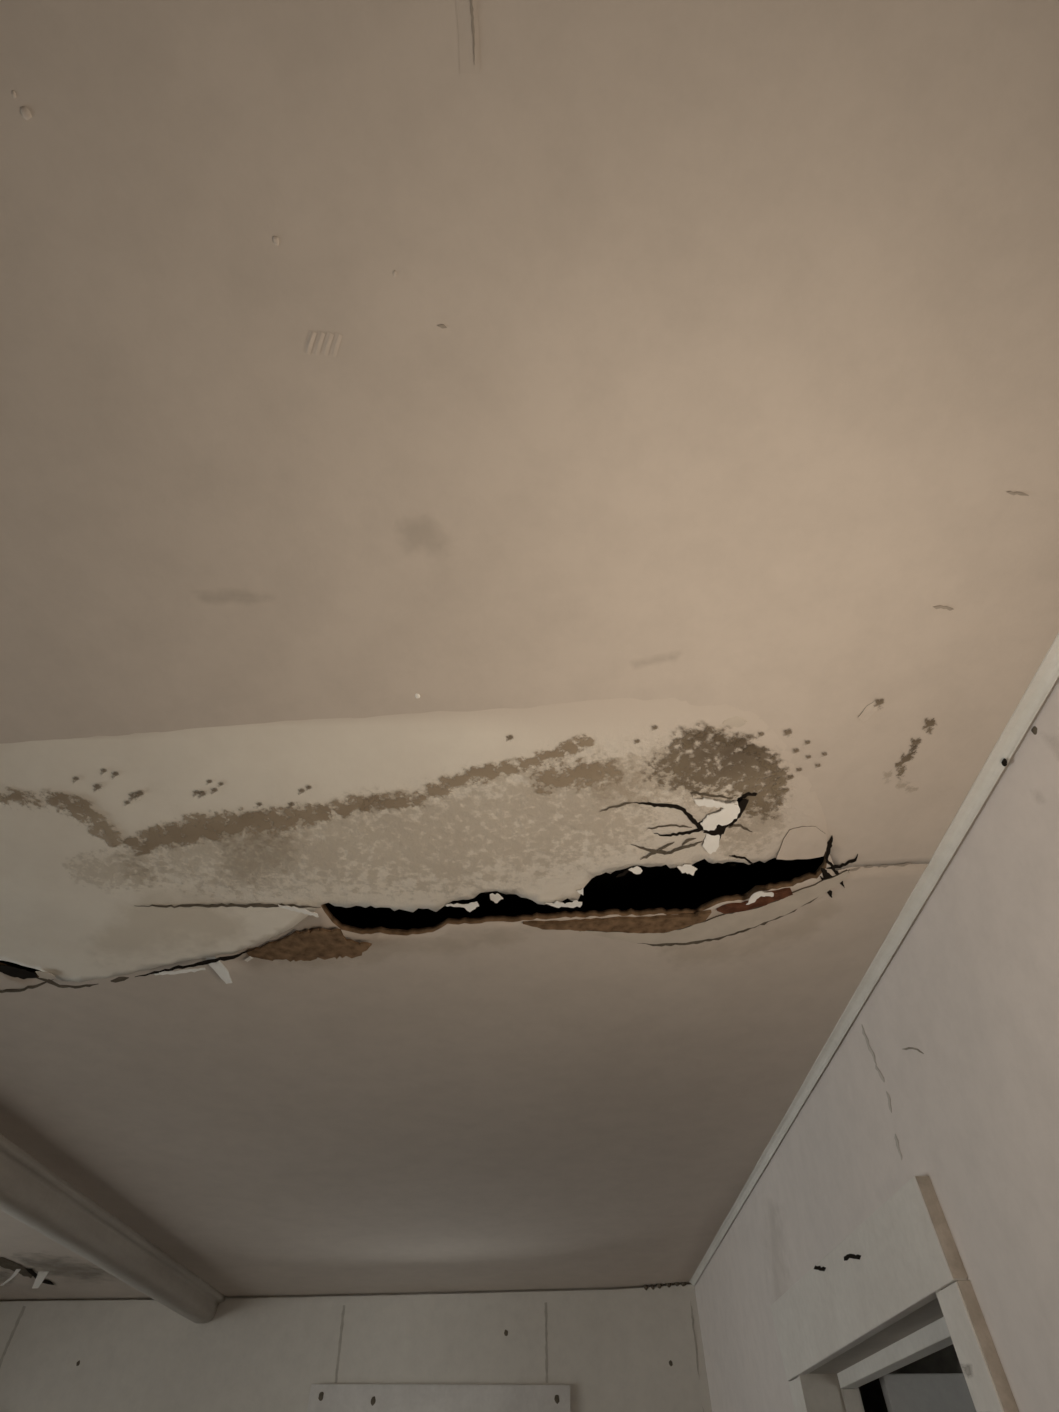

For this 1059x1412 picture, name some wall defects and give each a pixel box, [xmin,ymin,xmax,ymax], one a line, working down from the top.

damp [0,734,624,856]
damp [644,725,827,820]
spalling [278,791,849,944]
crack [638,836,912,947]
spalling [0,960,42,972]